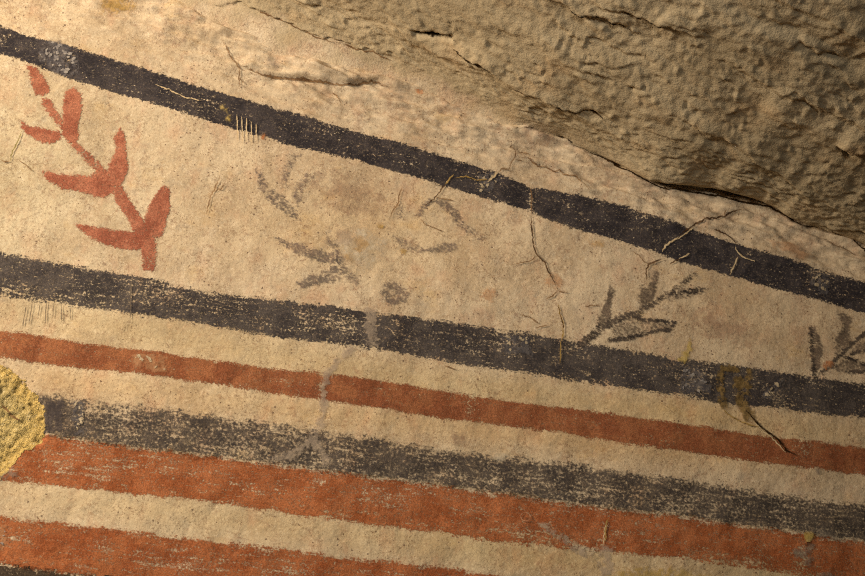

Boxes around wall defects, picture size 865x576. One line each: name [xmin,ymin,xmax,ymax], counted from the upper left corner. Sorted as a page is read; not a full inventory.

crack [422,126,589,231]
crack [516,189,567,361]
crack [556,135,816,279]
crack [724,410,796,455]